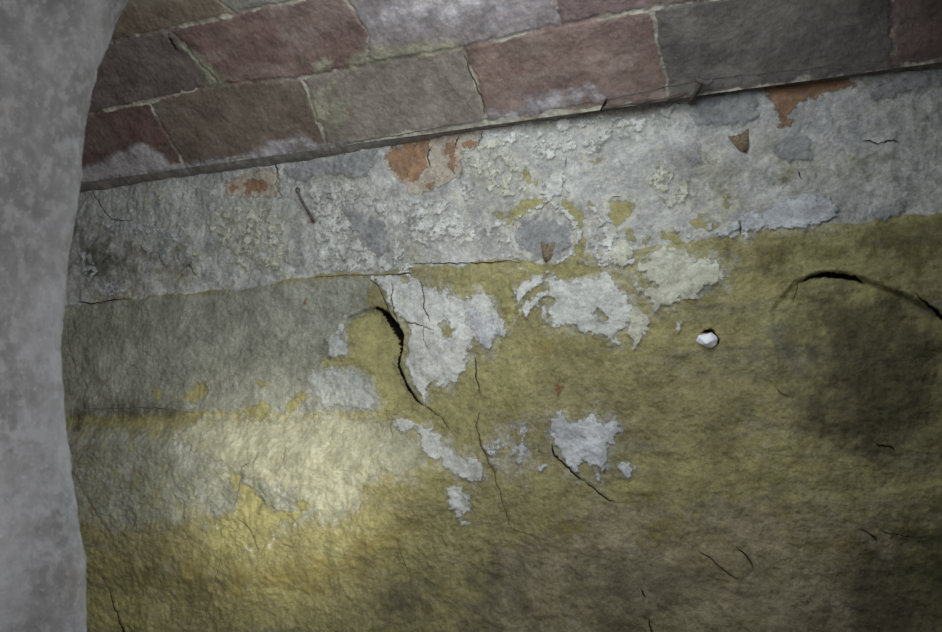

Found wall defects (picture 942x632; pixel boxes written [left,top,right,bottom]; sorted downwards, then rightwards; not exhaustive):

crack [314,260,520,430]
peeling [177,102,839,558]
crack [793,272,864,301]
crack [914,292,942,320]
crack [475,359,547,541]
crack [538,444,614,502]